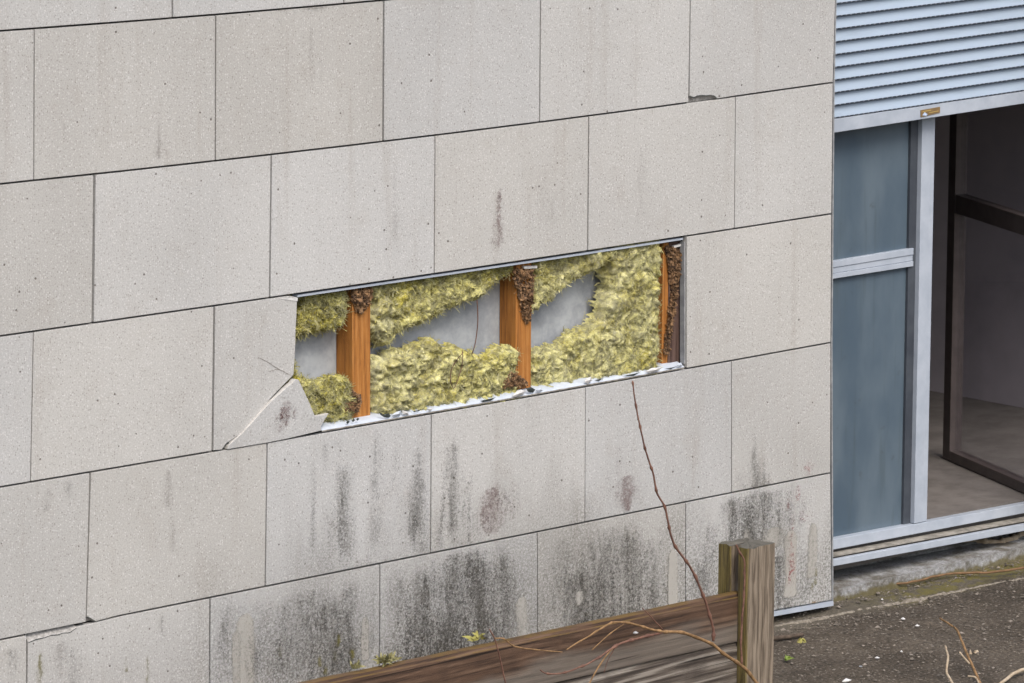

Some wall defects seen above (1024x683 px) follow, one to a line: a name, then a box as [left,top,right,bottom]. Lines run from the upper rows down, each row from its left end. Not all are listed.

leakage [408,560,489,658]
leakage [504,597,528,636]
leakage [651,550,678,607]
leakage [743,516,818,598]